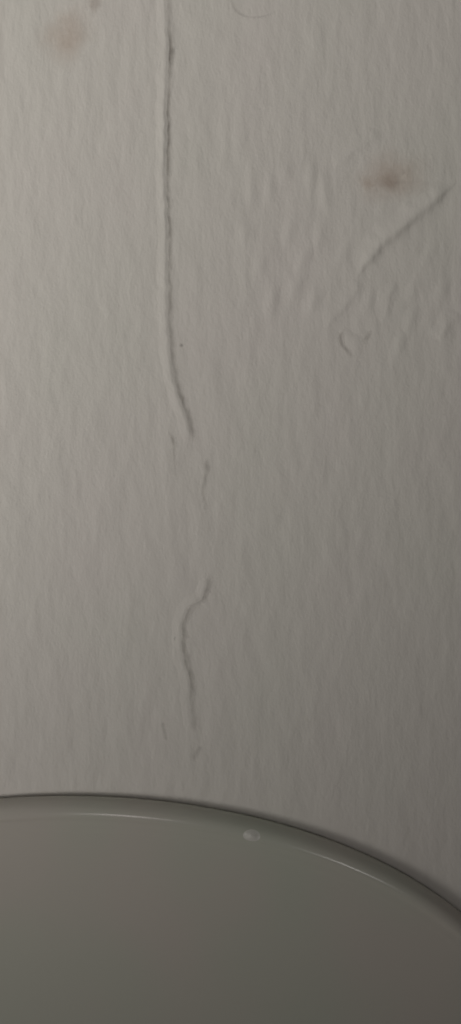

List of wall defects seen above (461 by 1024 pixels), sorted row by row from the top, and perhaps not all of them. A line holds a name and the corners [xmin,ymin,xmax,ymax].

crack [154,0,196,443]
crack [171,573,211,733]